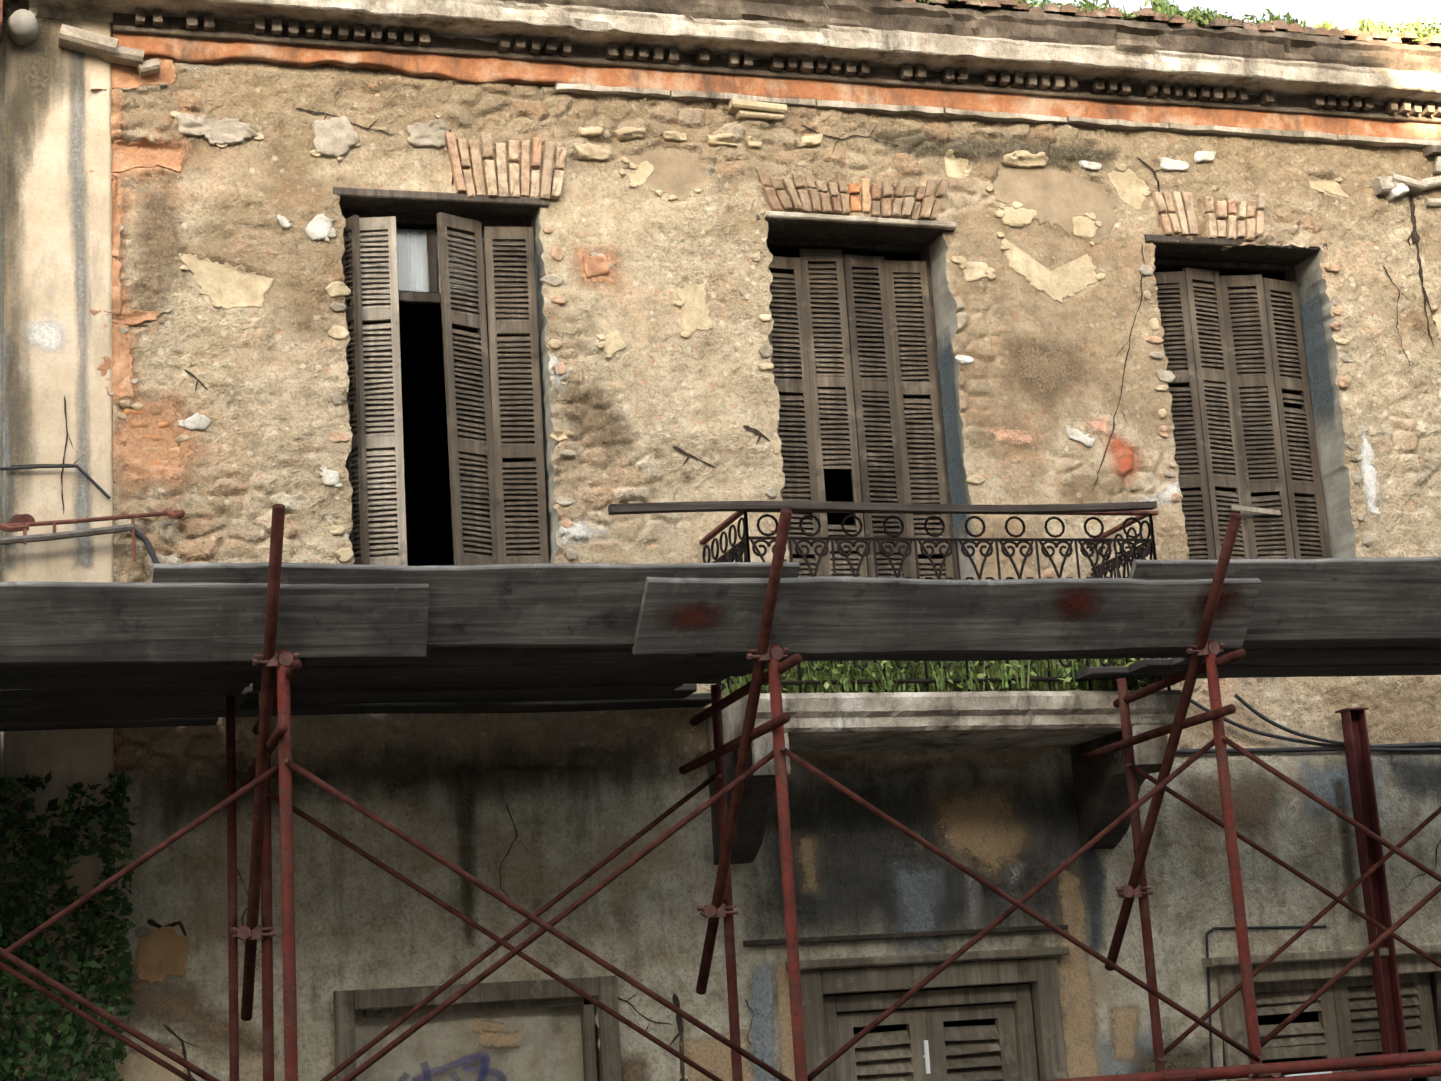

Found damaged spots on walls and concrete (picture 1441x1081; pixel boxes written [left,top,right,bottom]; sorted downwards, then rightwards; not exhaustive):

water stain [4,0,92,567]
spalling [90,56,273,489]
spalling [310,115,361,162]
spalling [325,281,351,340]
spalling [572,127,762,201]
peeling [944,149,971,179]
spalling [951,152,1150,304]
peeling [1159,151,1216,172]
peeling [1308,176,1348,198]
peeling [937,333,985,538]
spalling [1145,318,1175,438]
water stain [757,775,1104,950]